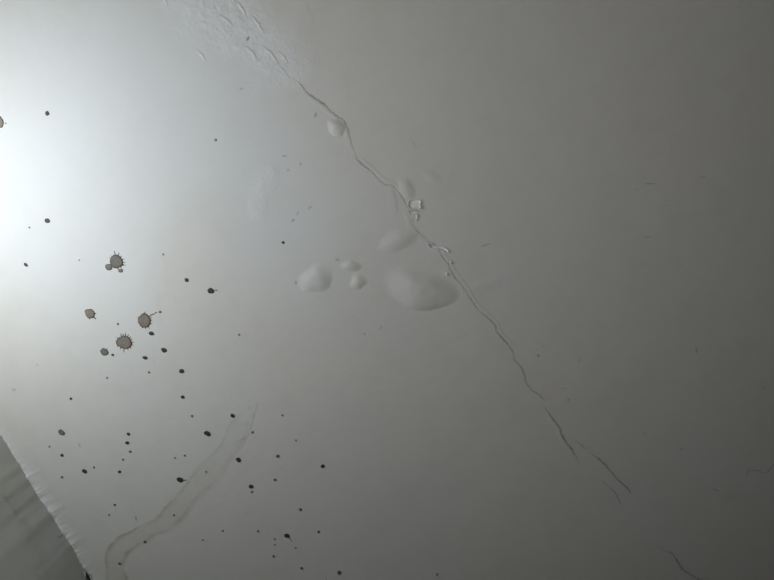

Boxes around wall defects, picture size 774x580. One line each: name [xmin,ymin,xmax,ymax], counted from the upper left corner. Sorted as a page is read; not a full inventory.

damp [104,398,257,580]